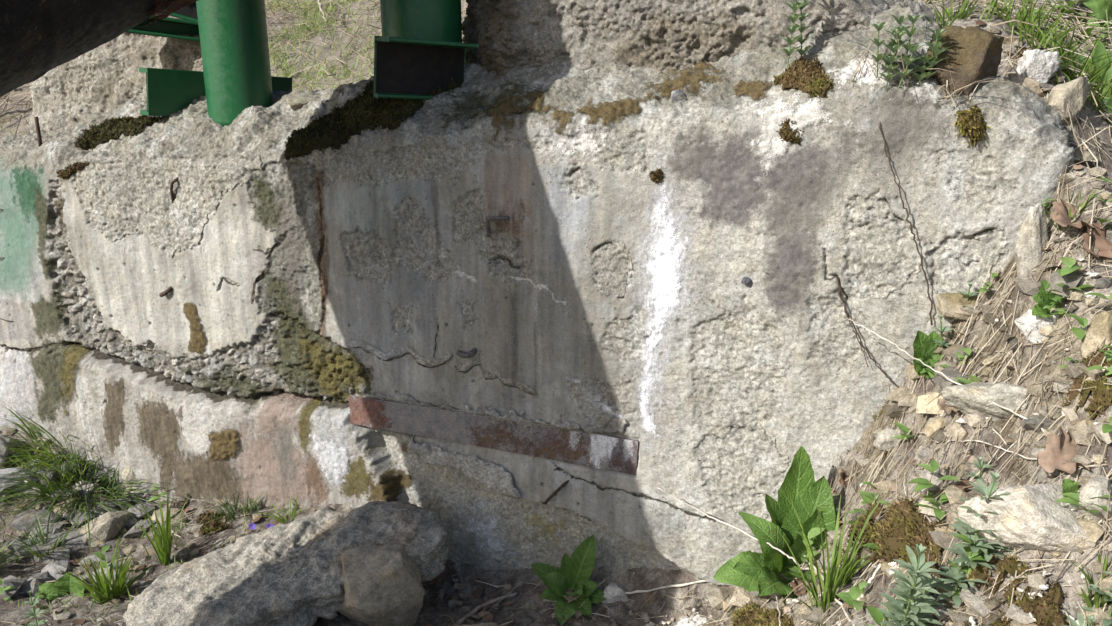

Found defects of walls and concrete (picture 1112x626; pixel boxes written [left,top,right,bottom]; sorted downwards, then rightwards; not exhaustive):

damp [635,54,960,446]
spalling [46,153,633,436]
crack [823,251,848,299]
corrosion [349,396,393,429]
corrosion [468,420,592,467]
corrosion [606,437,638,475]
crack [553,464,716,522]